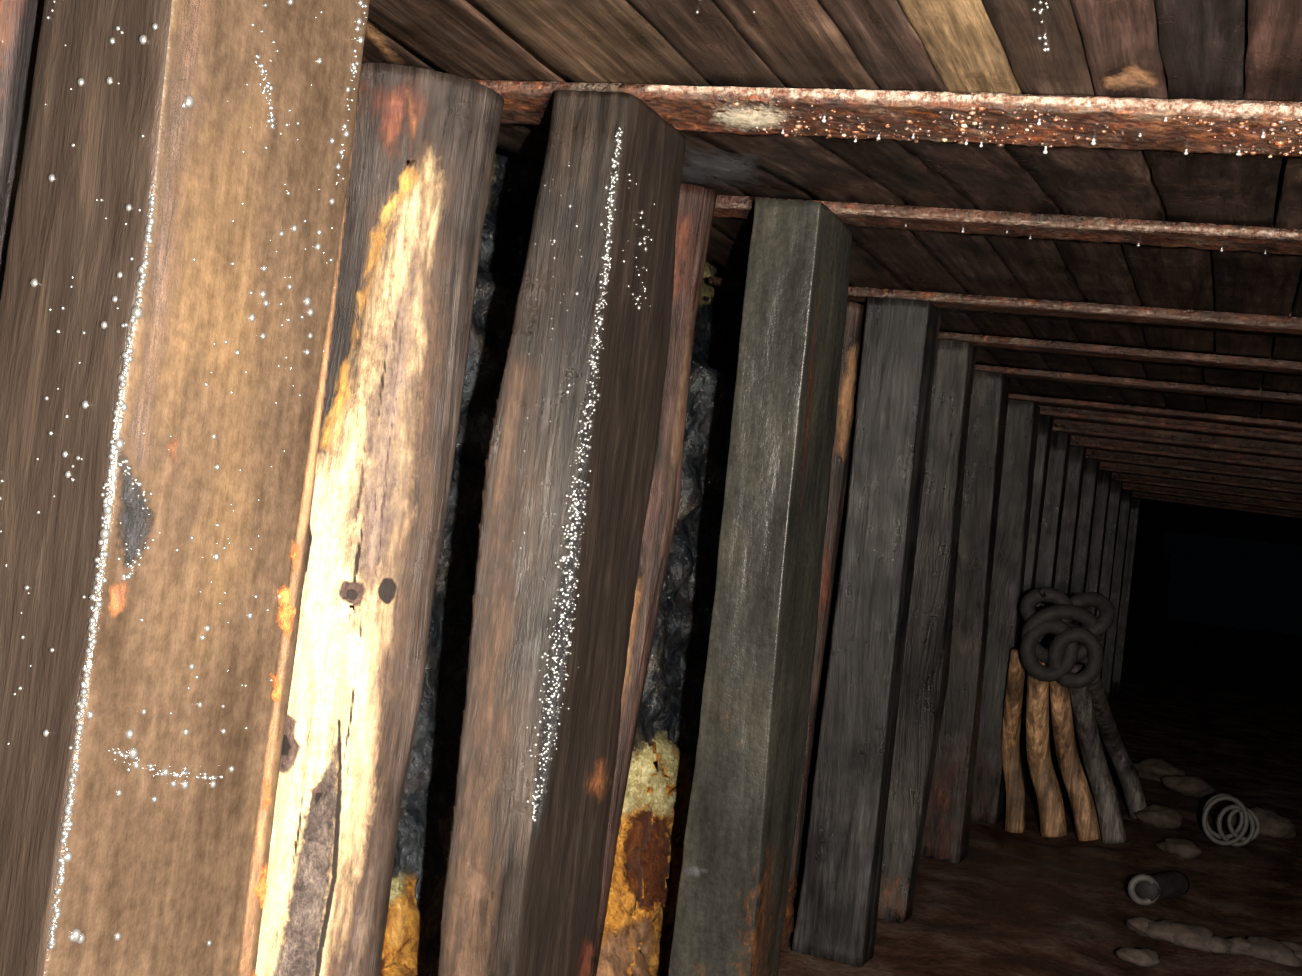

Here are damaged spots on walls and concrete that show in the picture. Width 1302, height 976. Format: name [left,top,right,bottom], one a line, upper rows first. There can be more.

corrosion [733,100,1124,148]
corrosion [1172,116,1302,158]
damp [48,0,223,950]
corrosion [239,207,346,976]
crack [293,799,303,863]
crack [315,689,354,976]